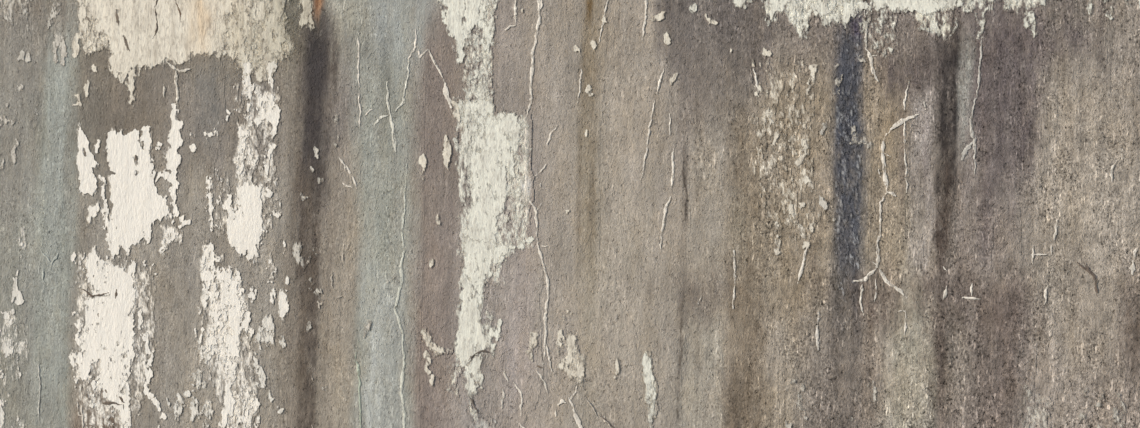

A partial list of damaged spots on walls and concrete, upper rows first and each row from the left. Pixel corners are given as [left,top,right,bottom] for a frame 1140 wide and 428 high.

peeling [0,0,31,32]
peeling [47,0,322,428]
leakage [277,0,442,428]
crack [357,29,452,428]
peeling [419,0,535,428]
peeling [651,11,671,45]
peeling [689,3,718,25]
leakage [648,0,1115,428]
peeling [733,0,1045,303]
leakage [1112,266,1140,391]